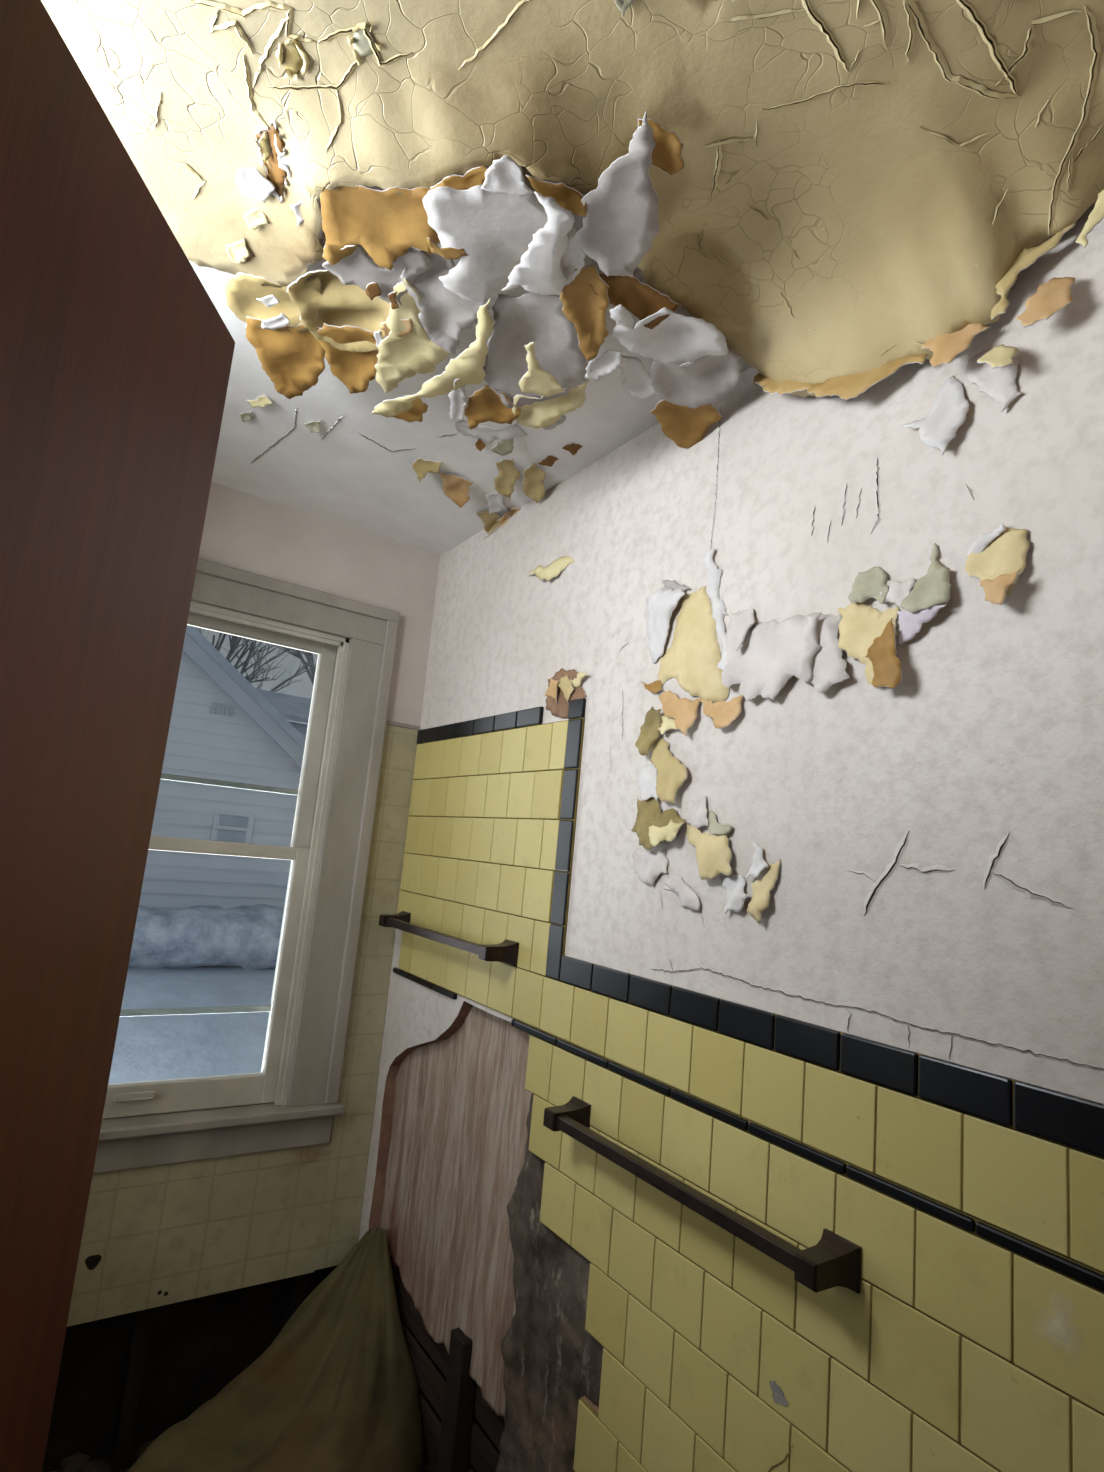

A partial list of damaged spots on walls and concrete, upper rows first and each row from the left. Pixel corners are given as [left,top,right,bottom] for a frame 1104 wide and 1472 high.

crack [190,0,411,171]
crack [458,0,531,70]
crack [154,92,205,200]
peeling [41,0,1104,540]
peeling [545,668,588,719]
peeling [631,522,1030,924]
crack [659,873,705,929]
crack [846,830,1073,916]
crack [650,960,1104,1071]
spalling [307,1265,338,1297]
spalling [42,1313,132,1472]
spalling [134,1278,287,1447]